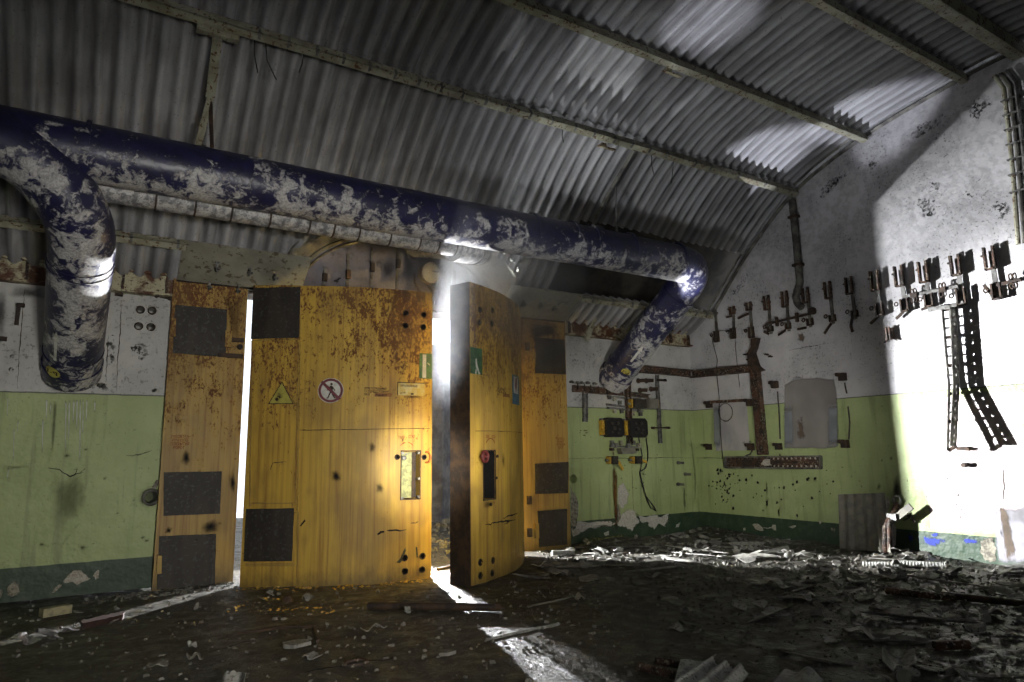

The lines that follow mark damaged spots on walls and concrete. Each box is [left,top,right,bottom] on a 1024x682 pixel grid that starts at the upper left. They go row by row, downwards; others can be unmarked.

peeling [570,465,680,537]
peeling [907,392,1024,562]
peeling [52,570,99,593]